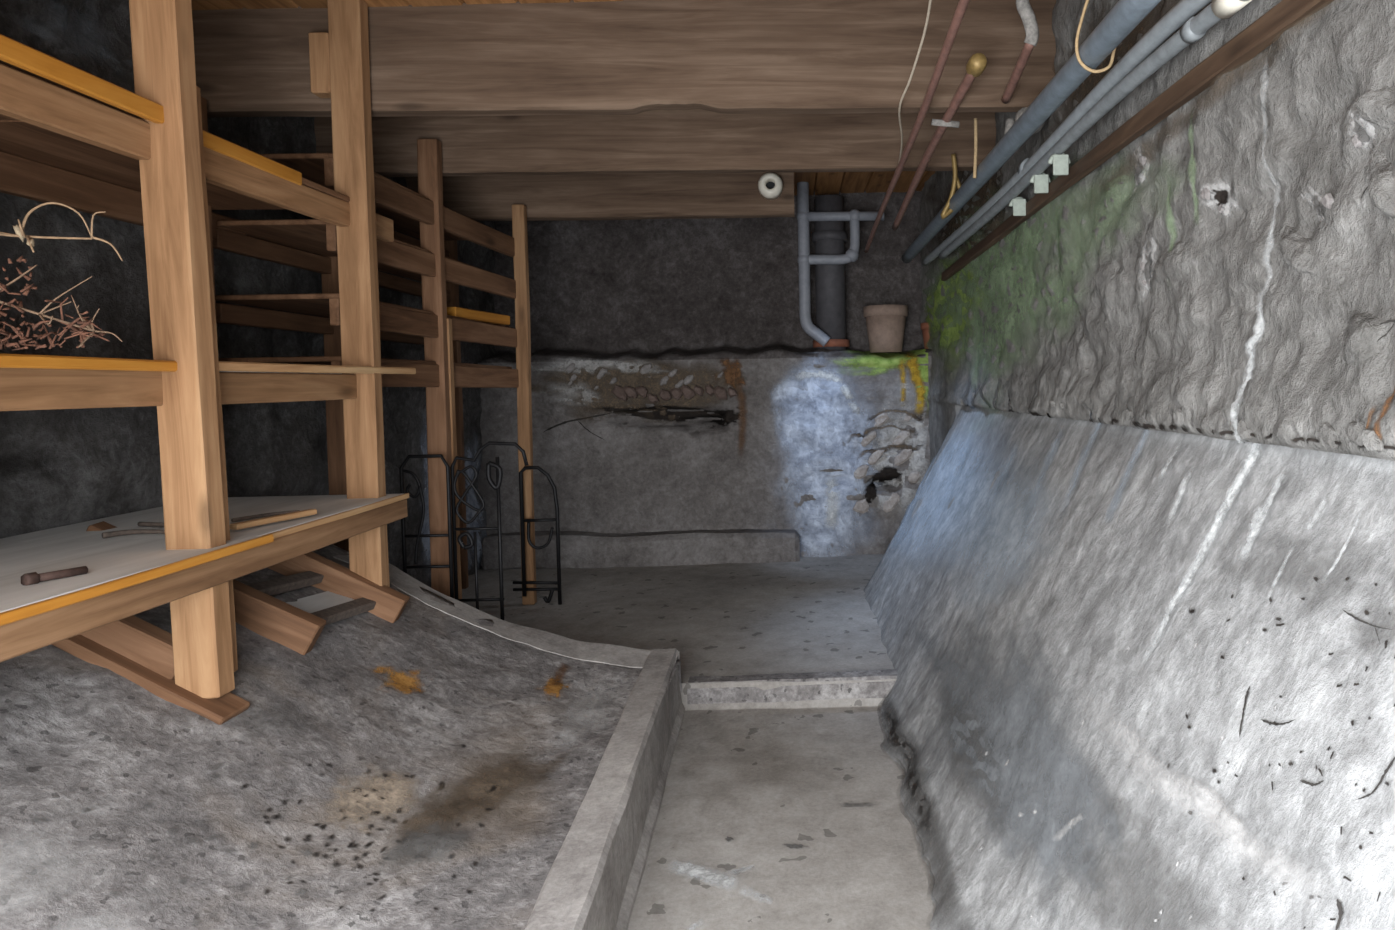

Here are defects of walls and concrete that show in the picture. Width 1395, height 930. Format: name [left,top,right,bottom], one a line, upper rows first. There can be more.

water stain [1066,14,1152,113]
water stain [933,169,1005,252]
flaking render [874,388,928,510]
water stain [387,760,554,861]